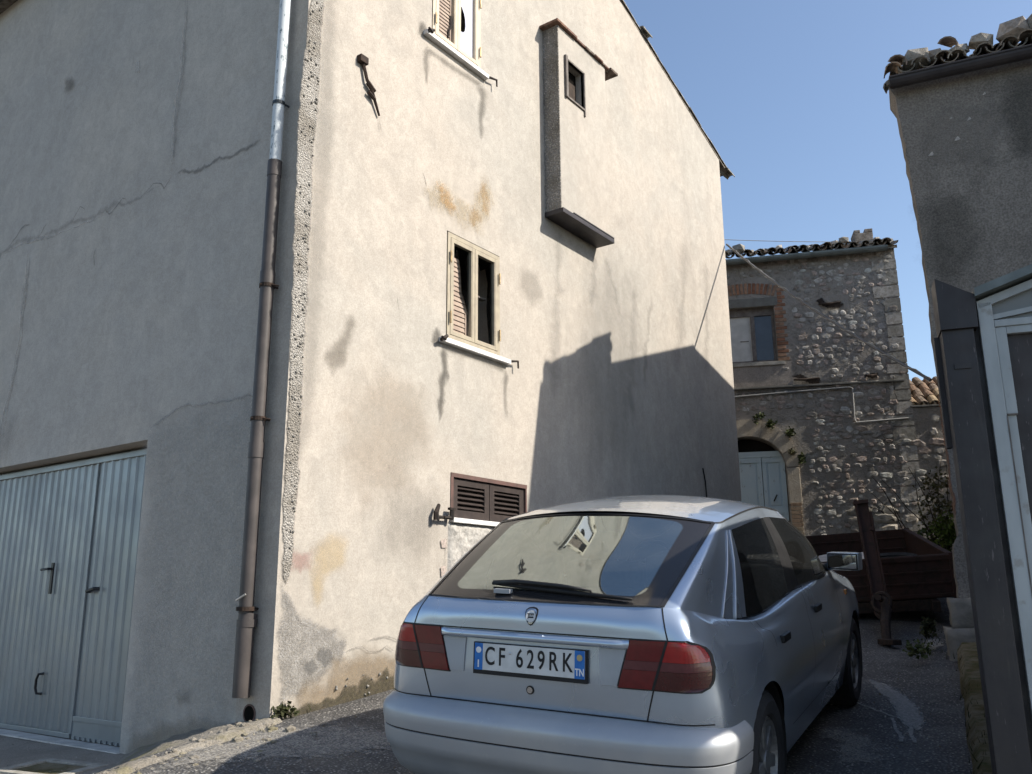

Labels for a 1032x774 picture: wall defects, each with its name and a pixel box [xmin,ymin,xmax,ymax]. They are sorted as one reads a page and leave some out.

damp [290,657,396,717]
damp [171,726,391,767]